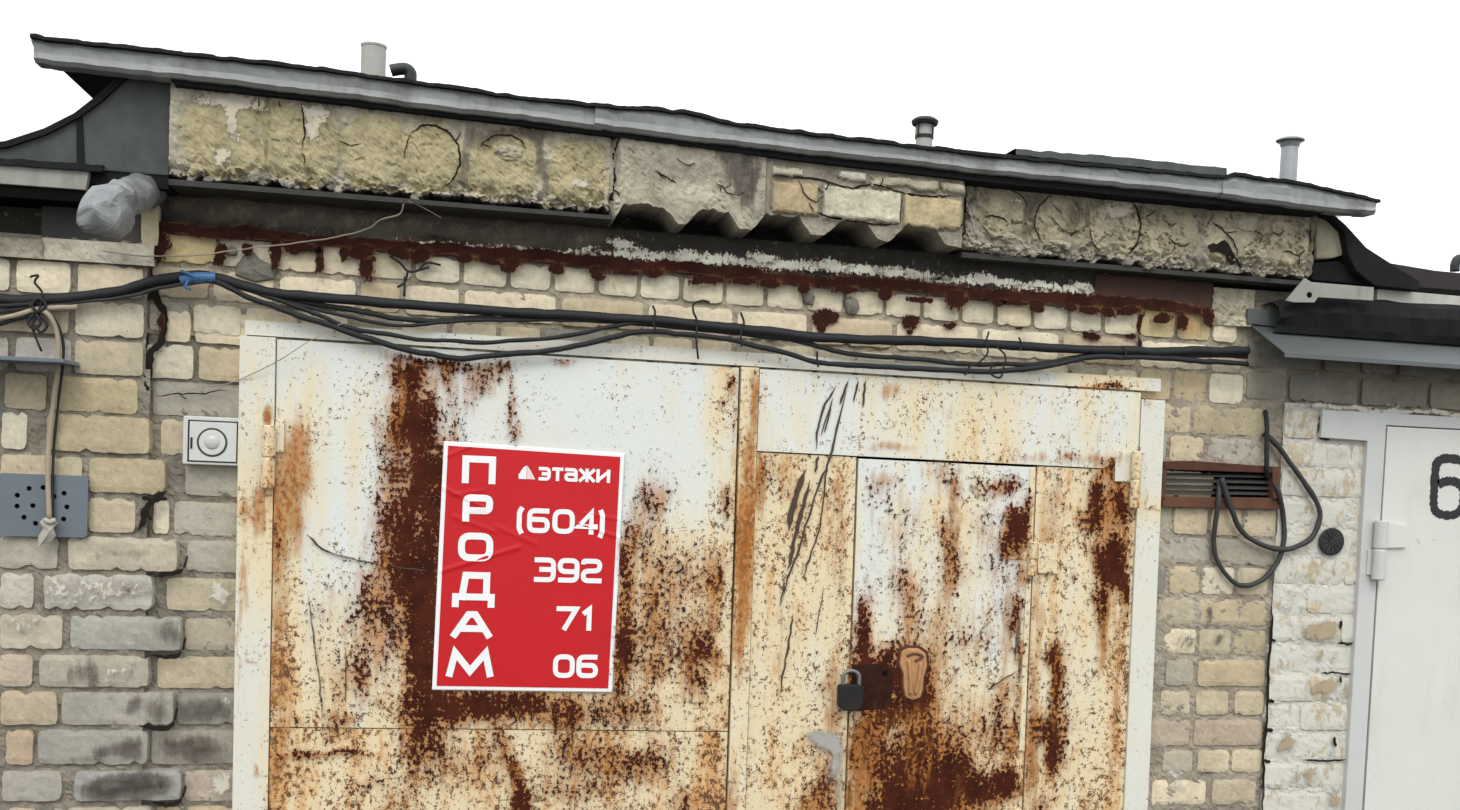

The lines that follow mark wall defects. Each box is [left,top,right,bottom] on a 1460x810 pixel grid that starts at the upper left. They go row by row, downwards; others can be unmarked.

crack [258,98,306,164]
spalling [171,167,608,213]
crack [341,124,526,188]
corrosion [154,221,1215,347]
corrosion [1065,380,1127,390]
corrosion [241,425,312,583]
corrosion [256,351,808,810]
corrosion [796,449,1160,810]